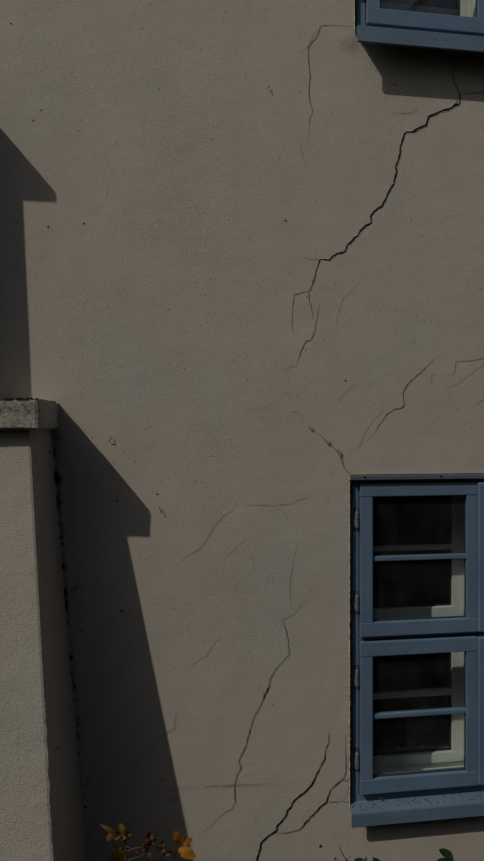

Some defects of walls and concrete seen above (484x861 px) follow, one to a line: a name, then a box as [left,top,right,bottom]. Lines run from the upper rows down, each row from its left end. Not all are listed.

crack [295,25,353,162]
crack [282,53,484,370]
crack [293,357,484,472]
crack [205,543,306,830]
crack [256,733,350,861]